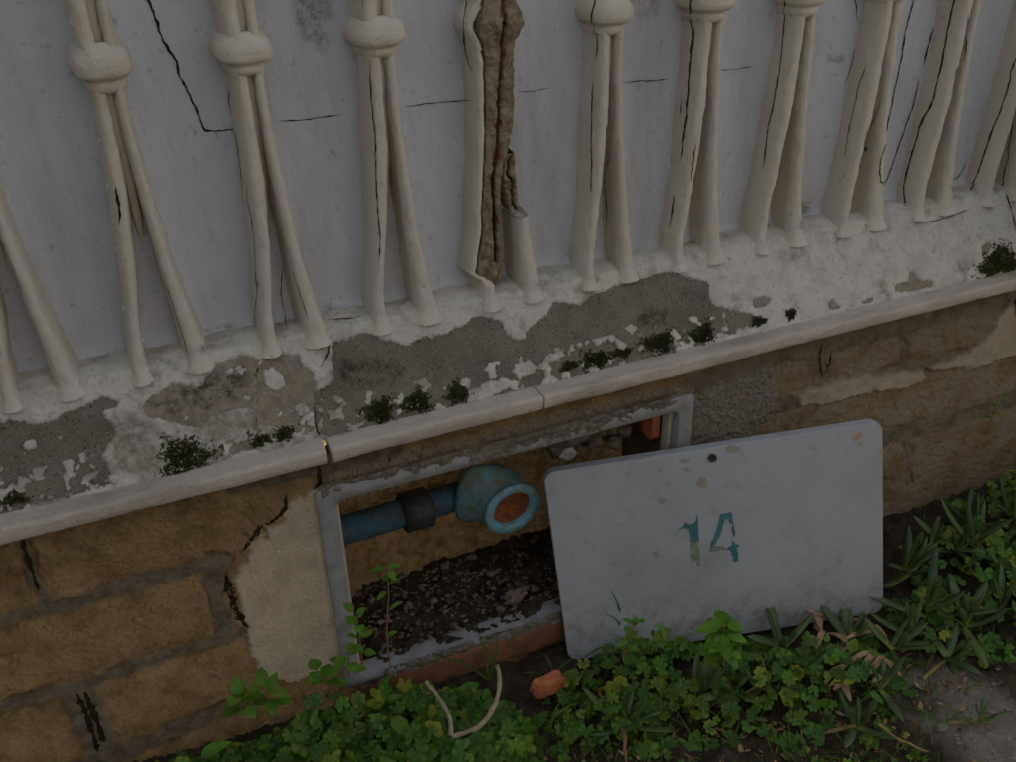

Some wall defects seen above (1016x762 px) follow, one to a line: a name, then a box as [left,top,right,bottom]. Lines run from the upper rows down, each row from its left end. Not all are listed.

crack [147,0,359,331]
spalling [473,0,525,288]
peeling [0,396,120,514]
peeling [143,272,771,458]